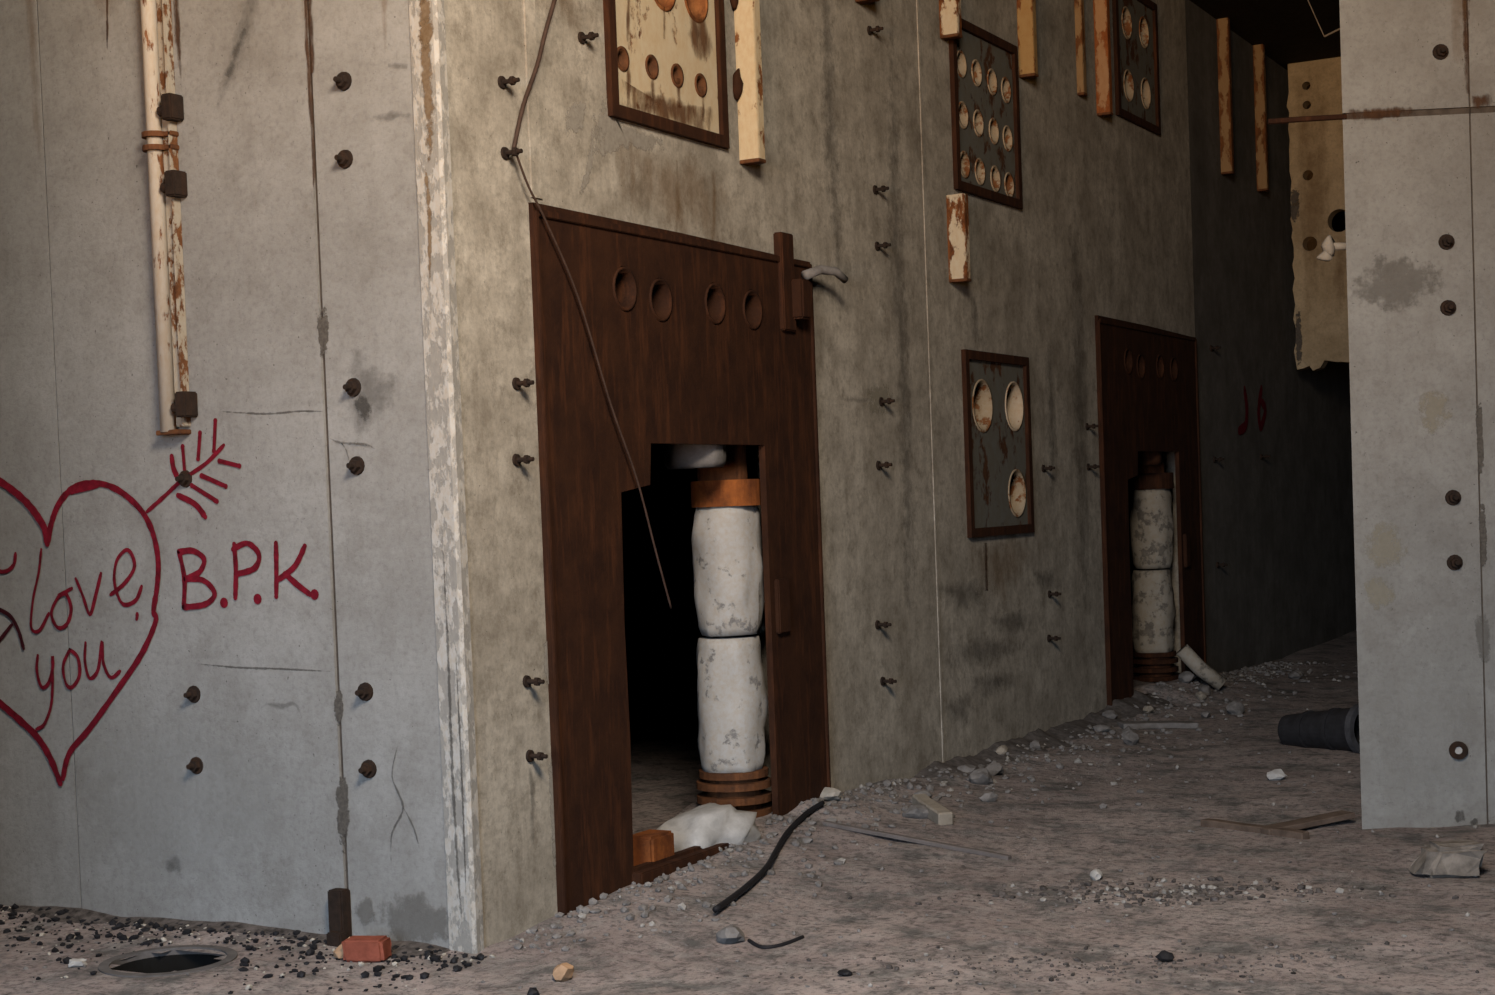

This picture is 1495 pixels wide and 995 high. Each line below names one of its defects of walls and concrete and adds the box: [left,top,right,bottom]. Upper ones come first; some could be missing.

corrosion [1462,0,1489,107]
peeling [418,0,434,271]
corrosion [1351,107,1410,119]